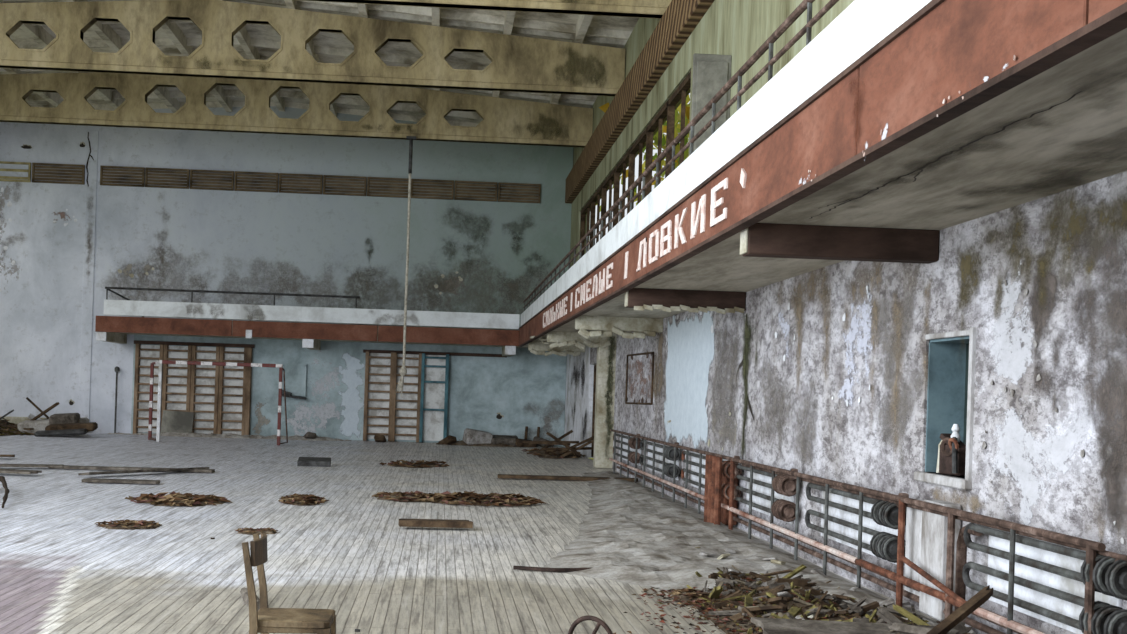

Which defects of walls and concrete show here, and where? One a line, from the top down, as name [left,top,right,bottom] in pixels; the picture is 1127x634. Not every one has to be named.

leakage [556,48,605,85]
flaking render [0,186,19,292]
leakage [224,210,543,321]
peeling [250,352,365,439]
leakage [712,329,790,446]
leakage [777,268,830,462]
leakage [845,262,930,464]
leakage [1031,258,1061,407]
leakage [1074,240,1127,545]